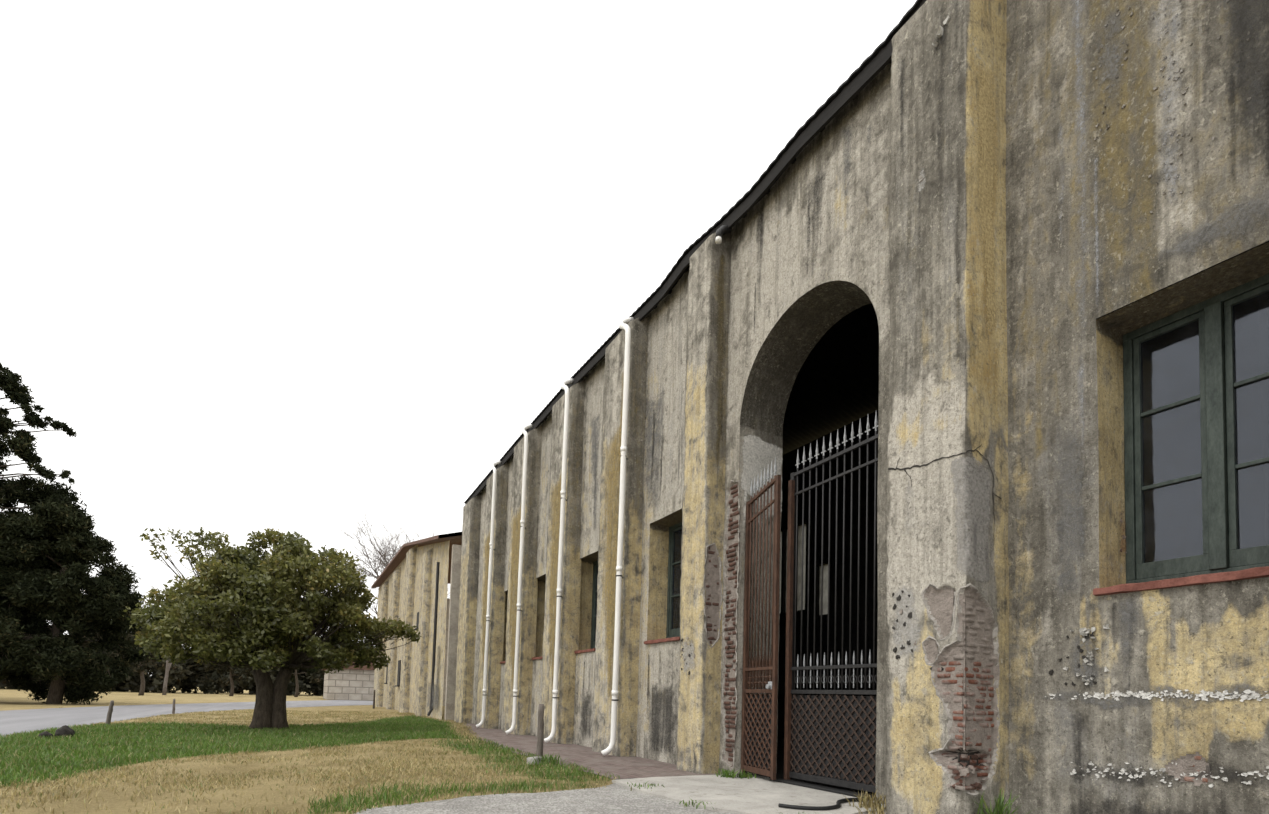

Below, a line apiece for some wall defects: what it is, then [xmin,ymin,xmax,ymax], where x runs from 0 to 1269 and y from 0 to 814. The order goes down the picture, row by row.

crack [888,444,1002,550]
spalling [680,480,740,770]
spalling [892,583,1000,797]